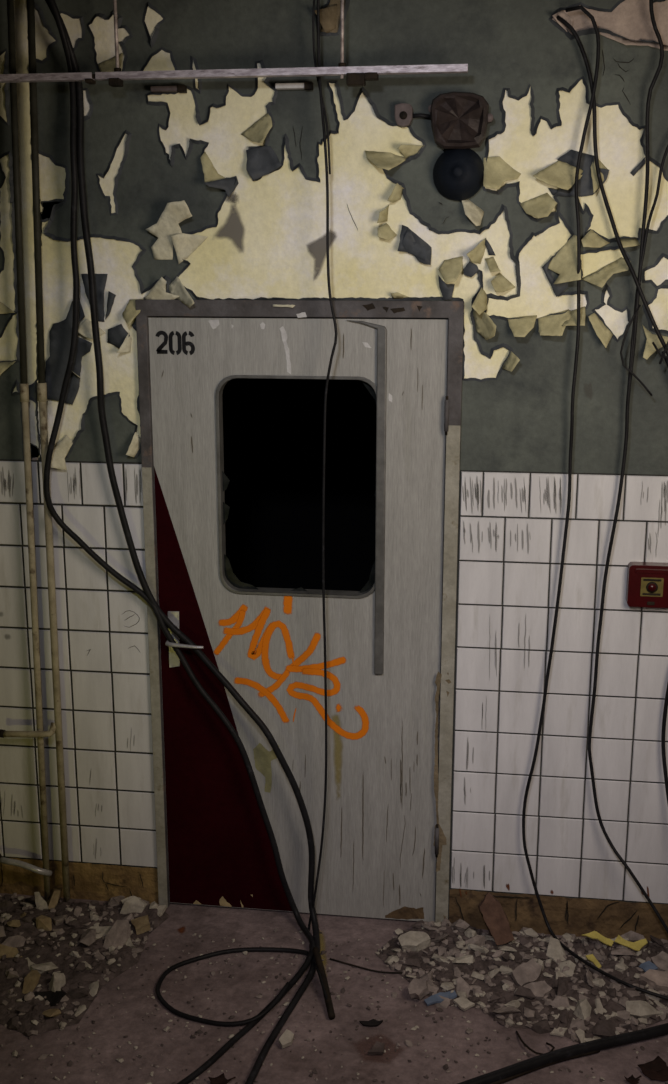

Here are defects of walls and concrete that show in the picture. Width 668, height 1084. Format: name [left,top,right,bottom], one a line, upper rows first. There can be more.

peeling [0,0,668,470]